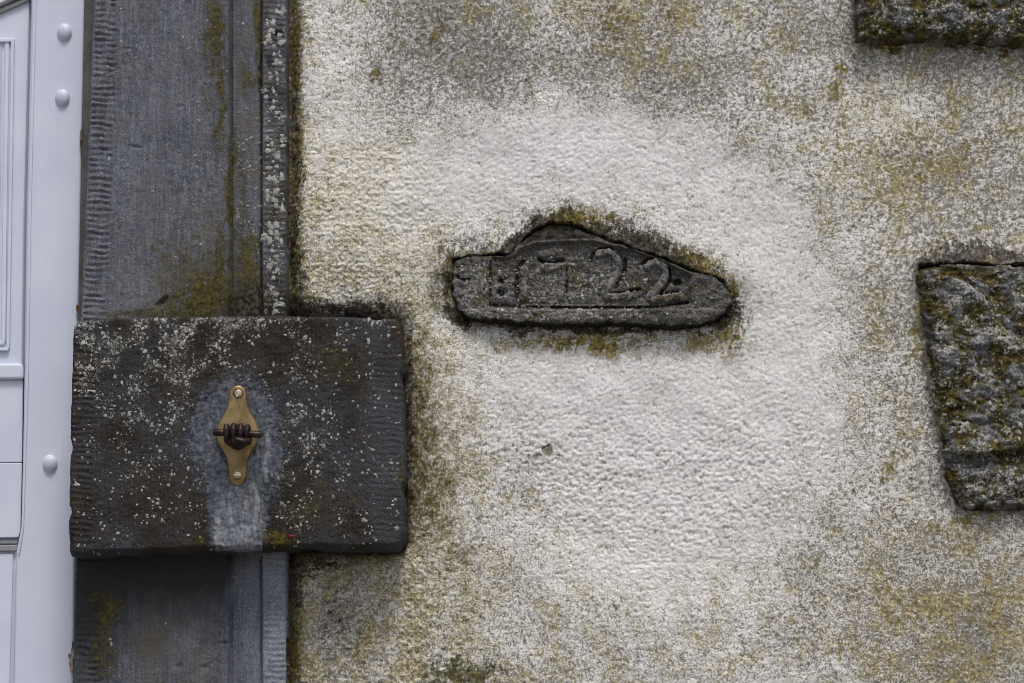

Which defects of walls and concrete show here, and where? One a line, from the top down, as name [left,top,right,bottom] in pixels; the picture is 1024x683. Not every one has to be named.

leakage [427,198,755,360]
leakage [184,368,287,553]